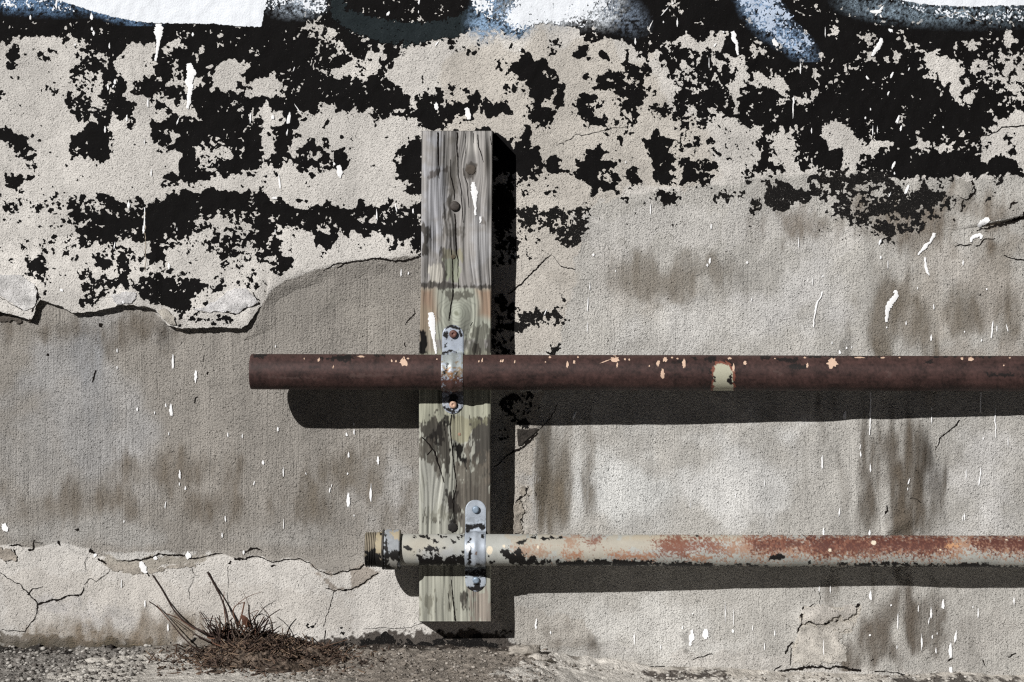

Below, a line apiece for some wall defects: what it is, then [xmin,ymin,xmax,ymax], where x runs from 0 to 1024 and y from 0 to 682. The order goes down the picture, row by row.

peeling [0,0,1024,329]
crack [953,180,1024,261]
crack [508,255,575,294]
peeling [491,293,570,355]
water stain [529,437,568,532]
water stain [861,420,927,535]
crack [0,528,378,645]
crack [774,593,918,675]
water stain [860,586,939,665]